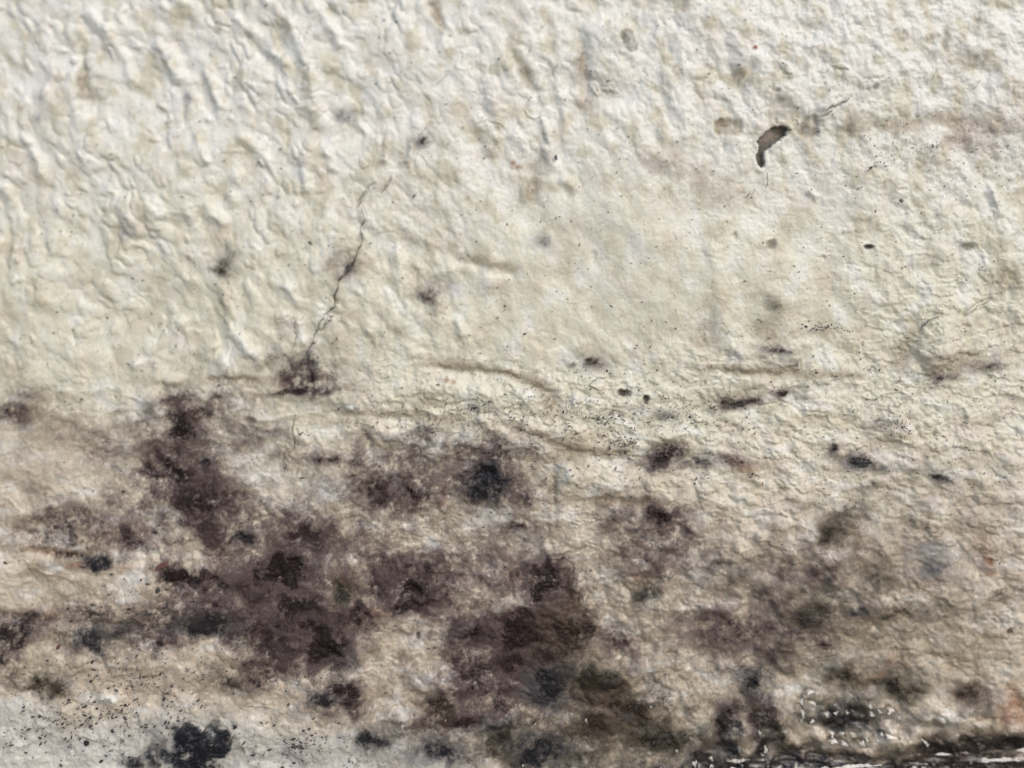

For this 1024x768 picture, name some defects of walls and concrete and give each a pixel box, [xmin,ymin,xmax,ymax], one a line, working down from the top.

spalling [756,116,815,168]
crack [274,176,392,367]
water stain [728,328,798,375]
water stain [487,367,546,394]
water stain [0,393,32,427]
water stain [29,509,147,573]
water stain [71,377,1024,768]
water stain [0,610,51,684]
water stain [27,671,66,700]